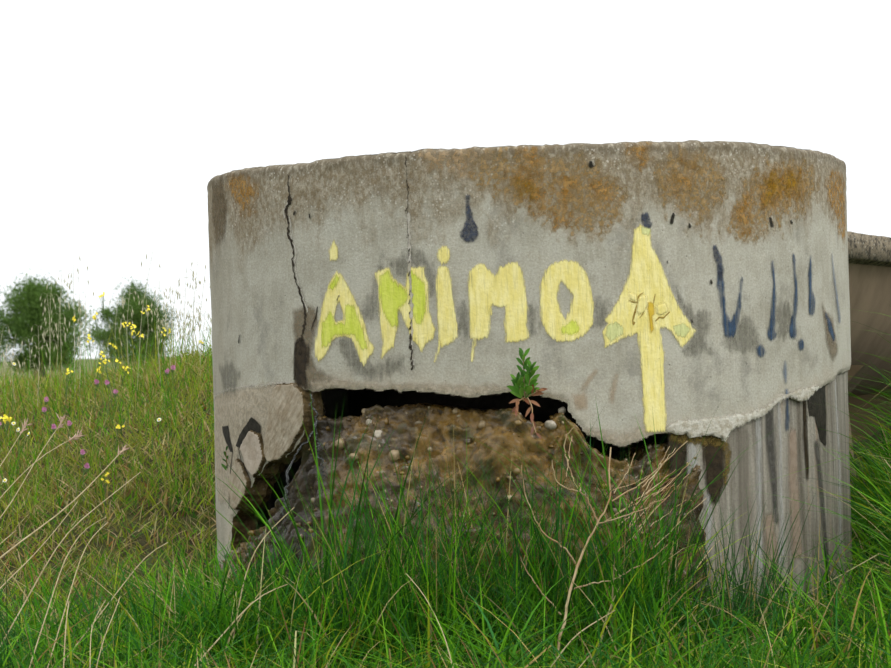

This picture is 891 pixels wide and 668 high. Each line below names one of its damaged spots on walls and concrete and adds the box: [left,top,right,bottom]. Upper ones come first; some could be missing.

crack [283,175,318,379]
crack [405,160,415,370]
spalling [211,380,832,630]
water stain [668,435,724,552]
water stain [739,382,839,612]